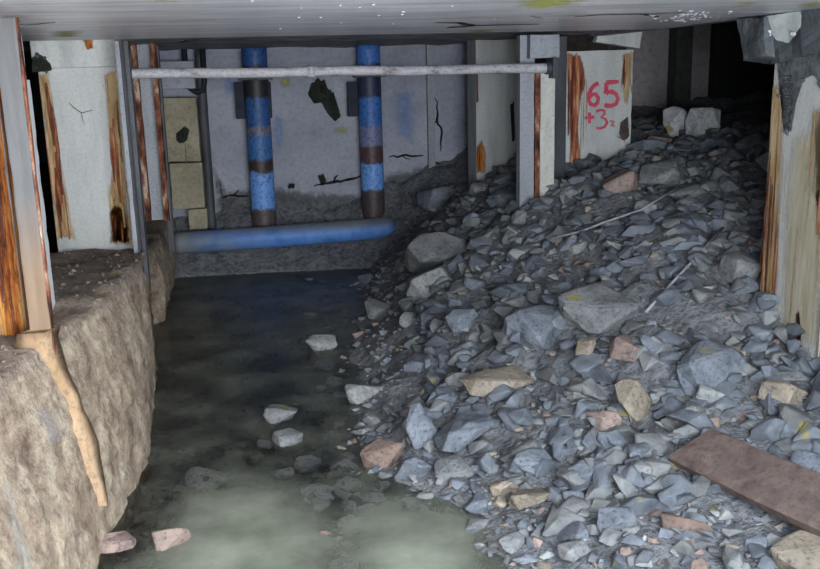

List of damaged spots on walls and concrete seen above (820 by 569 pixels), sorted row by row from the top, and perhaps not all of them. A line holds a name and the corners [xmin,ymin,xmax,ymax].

crack [437,12,686,28]
corrosion [0,88,30,336]
corrosion [15,17,56,355]
corrosion [38,73,73,239]
corrosion [105,71,132,245]
spalling [176,126,189,145]
spalling [308,76,341,121]
crack [389,97,443,159]
corrosion [567,53,587,164]
corrosion [621,52,633,102]
corrosion [759,87,820,358]
spalling [777,53,820,136]